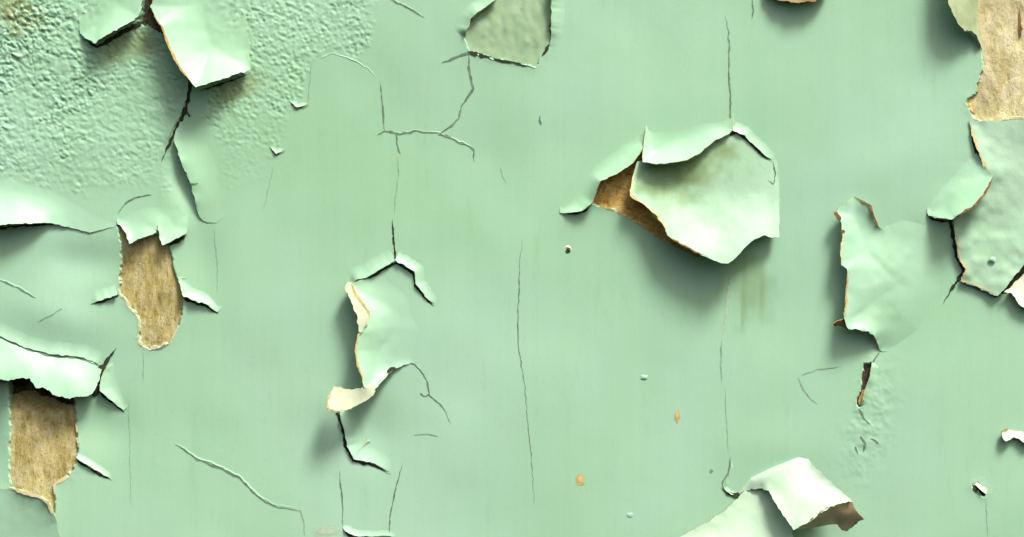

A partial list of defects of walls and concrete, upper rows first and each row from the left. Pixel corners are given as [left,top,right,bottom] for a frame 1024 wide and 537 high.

peeling [0,119,225,350]
peeling [78,0,251,91]
crack [161,79,192,162]
crack [308,52,475,212]
peeling [560,113,780,264]
peeling [833,0,1024,407]
peeling [0,323,128,537]
crack [175,443,305,534]
peeling [327,220,437,474]
crack [517,250,534,483]
peeling [680,456,864,537]
crack [798,367,836,404]